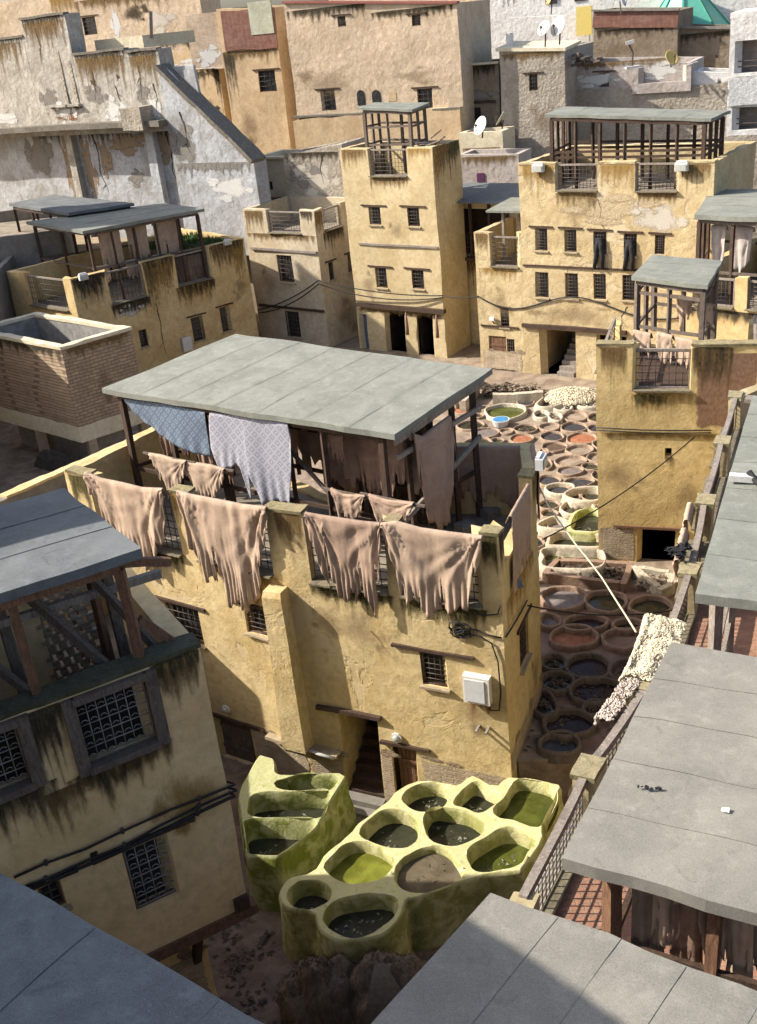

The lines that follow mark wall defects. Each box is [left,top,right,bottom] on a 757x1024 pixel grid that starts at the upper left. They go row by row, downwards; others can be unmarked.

water stain [74,43,277,110]
flaking render [24,80,162,199]
flaking render [207,177,254,203]
flaking render [561,193,689,232]
water stain [71,272,104,296]
water stain [112,256,173,315]
water stain [177,279,215,298]
water stain [150,649,199,694]
water stain [27,702,63,765]
water stain [0,743,171,833]